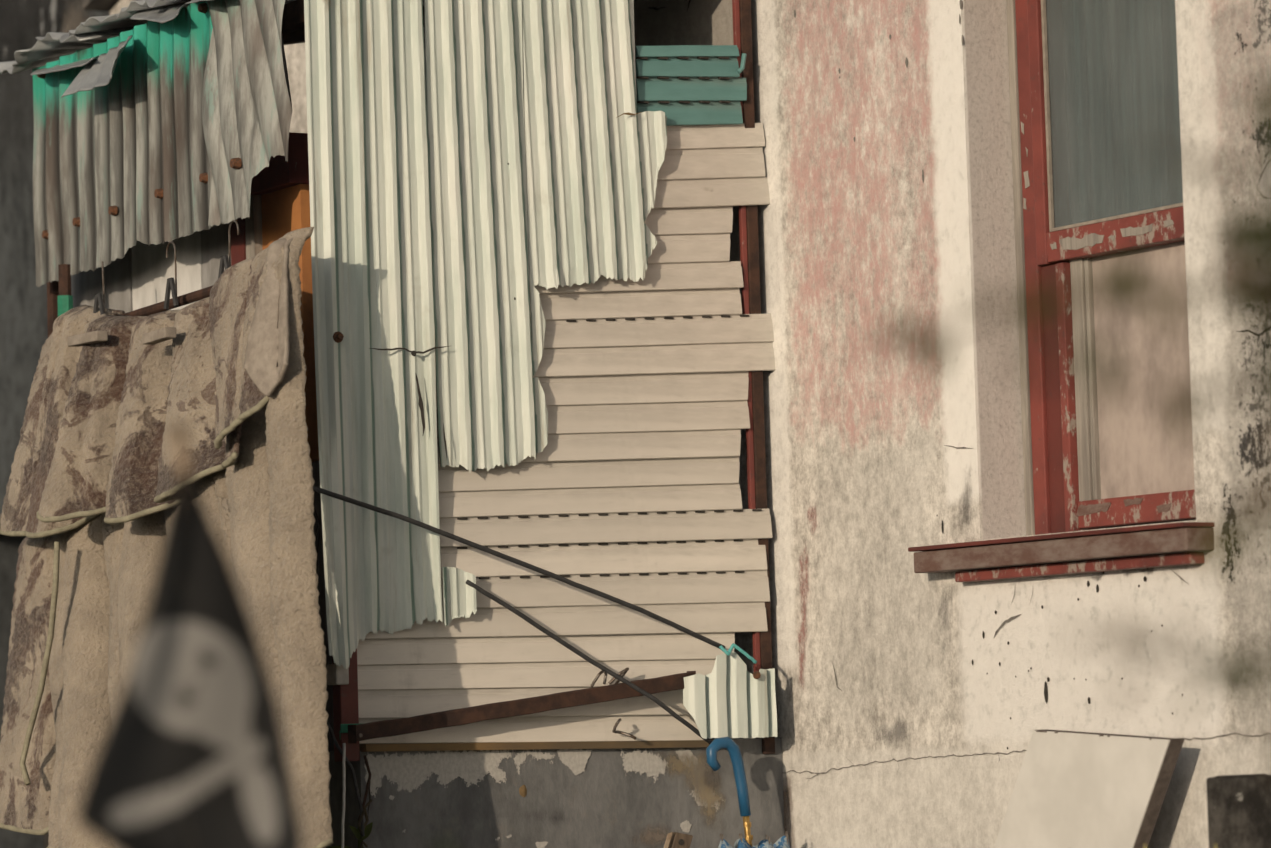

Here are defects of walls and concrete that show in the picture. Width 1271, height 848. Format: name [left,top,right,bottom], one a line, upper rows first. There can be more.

damp [1242,125,1271,160]
peeling [1050,220,1174,250]
crack [369,346,449,458]
crack [1178,732,1271,741]
peeling [364,749,592,801]
peeling [620,748,698,783]
crack [783,750,1027,779]